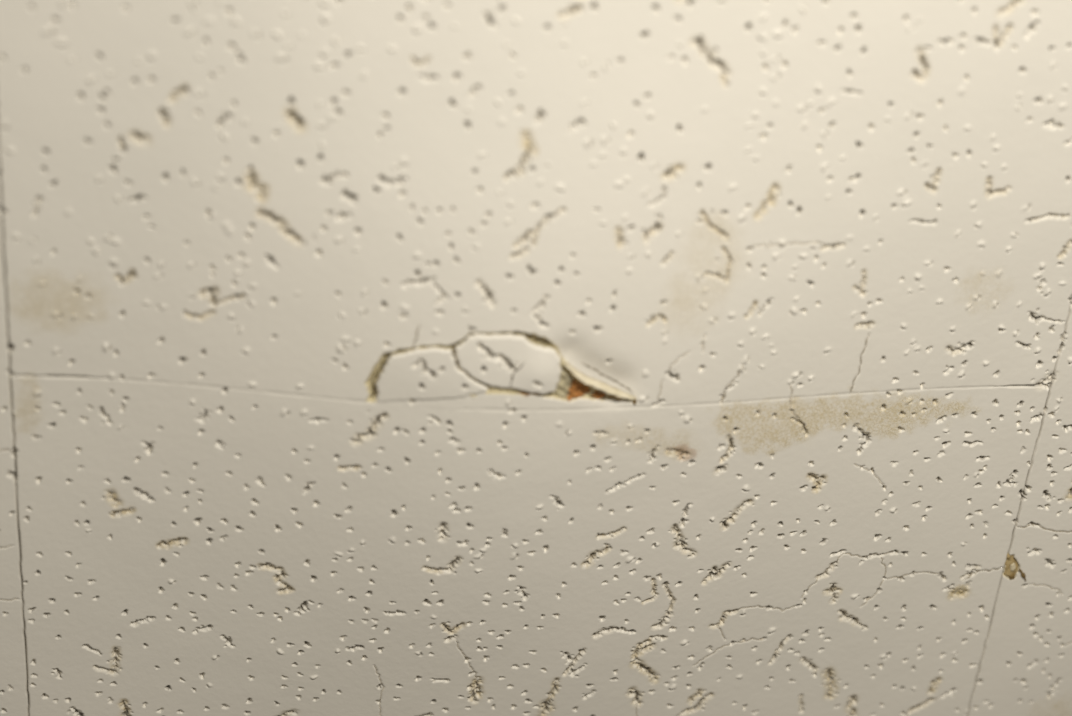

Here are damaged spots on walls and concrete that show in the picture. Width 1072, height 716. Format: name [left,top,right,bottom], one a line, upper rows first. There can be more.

spalling [375,332,562,413]